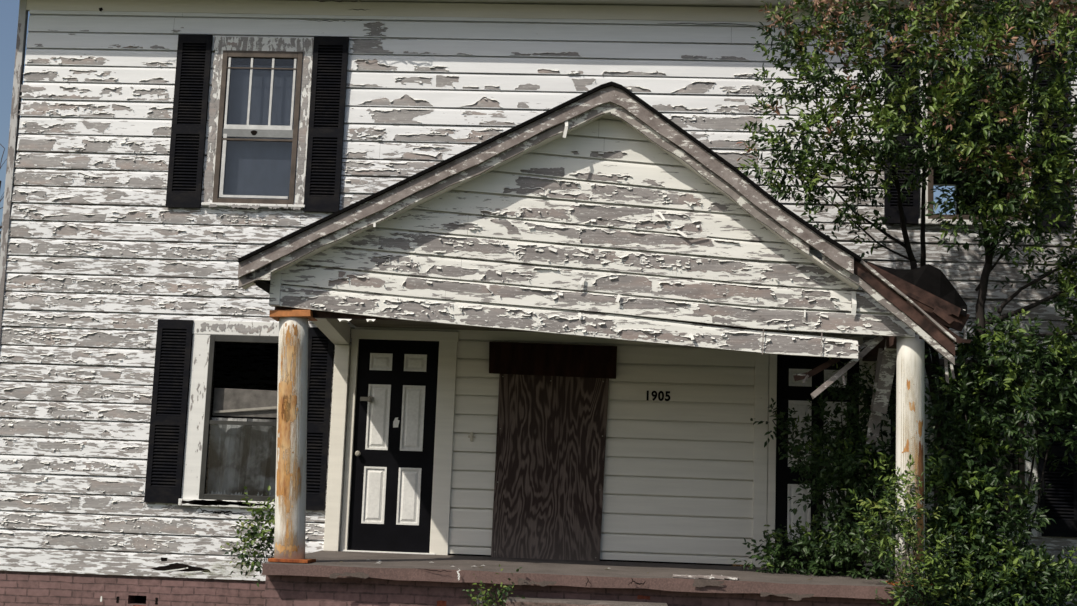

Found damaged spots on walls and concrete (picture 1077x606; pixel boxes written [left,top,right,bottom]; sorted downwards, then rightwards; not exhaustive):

crack [309,0,417,40]
peeling [341,22,520,206]
peeling [514,69,666,108]
peeling [571,150,627,159]
peeling [652,74,769,166]
peeling [0,44,310,555]
peeling [278,167,909,357]
rust [275,323,301,555]
rust [902,379,924,570]